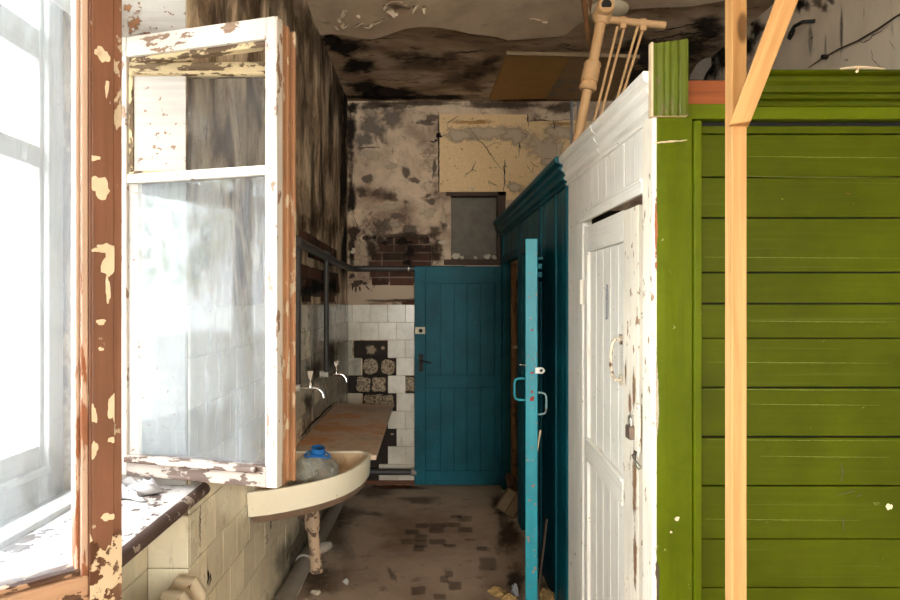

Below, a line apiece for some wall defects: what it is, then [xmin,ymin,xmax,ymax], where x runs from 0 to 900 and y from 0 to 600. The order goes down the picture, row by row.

peeling [333,1,427,30]
peeling [94,46,110,62]
leakage [211,0,574,302]
crack [431,114,569,191]
peeling [92,176,110,200]
peeling [92,243,115,304]
flaking render [351,227,445,285]
peeling [348,341,415,411]
peeling [367,425,397,480]